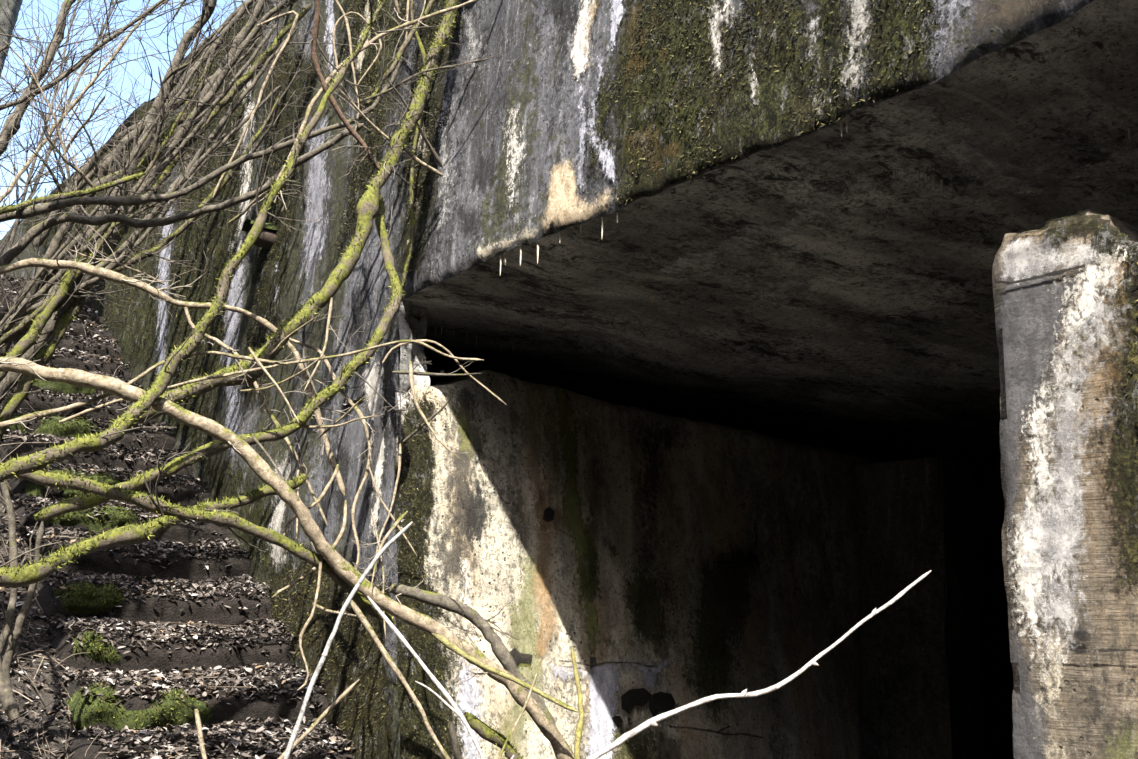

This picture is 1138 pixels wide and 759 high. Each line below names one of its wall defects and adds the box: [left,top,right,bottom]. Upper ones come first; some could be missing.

damp [155,200,174,374]
damp [220,66,256,367]
damp [301,117,330,280]
damp [417,97,525,241]
damp [570,0,625,188]
damp [708,0,734,69]
damp [841,0,870,84]
damp [223,386,242,435]
damp [427,382,493,605]
damp [996,243,1130,759]